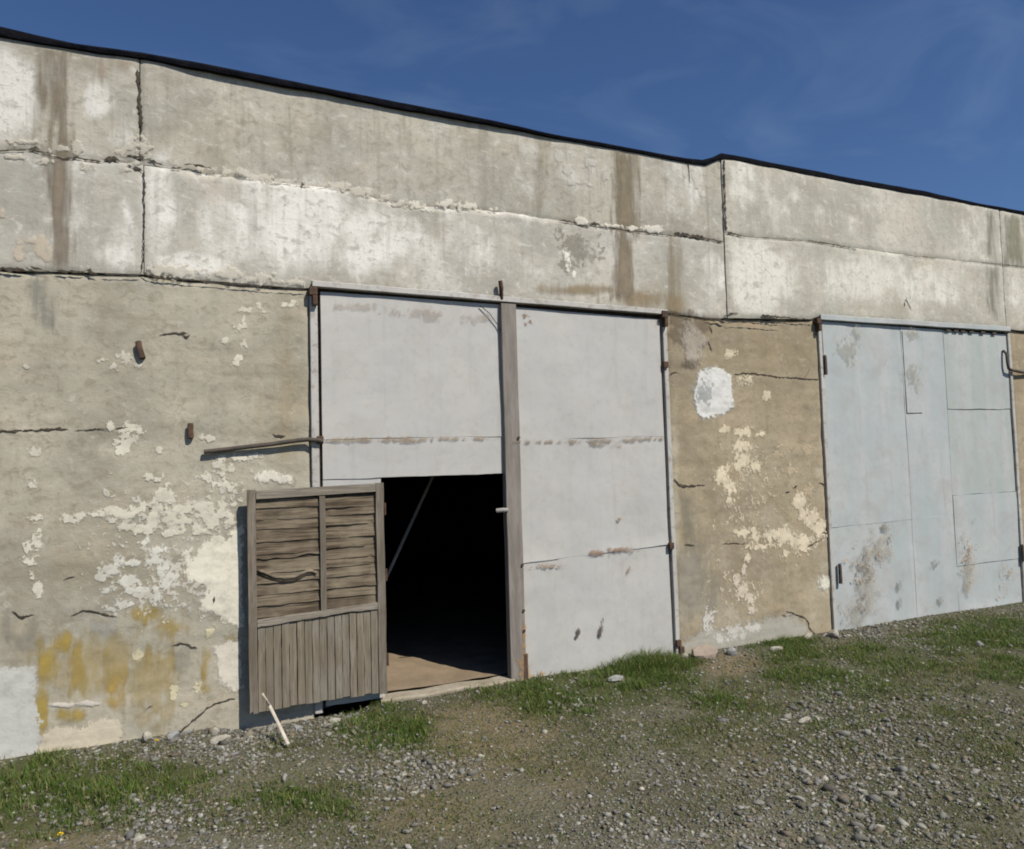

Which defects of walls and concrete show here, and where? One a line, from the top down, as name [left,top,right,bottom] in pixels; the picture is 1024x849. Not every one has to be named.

leakage [39,65,71,265]
crack [0,70,211,272]
spalling [575,215,665,234]
leakage [615,151,708,345]
crack [0,426,127,434]
peeling [106,420,163,456]
crack [71,609,114,617]
peeling [19,452,293,692]
corrosion [590,547,634,556]
peeling [691,348,827,659]
leakage [35,632,85,729]
crack [168,698,235,733]